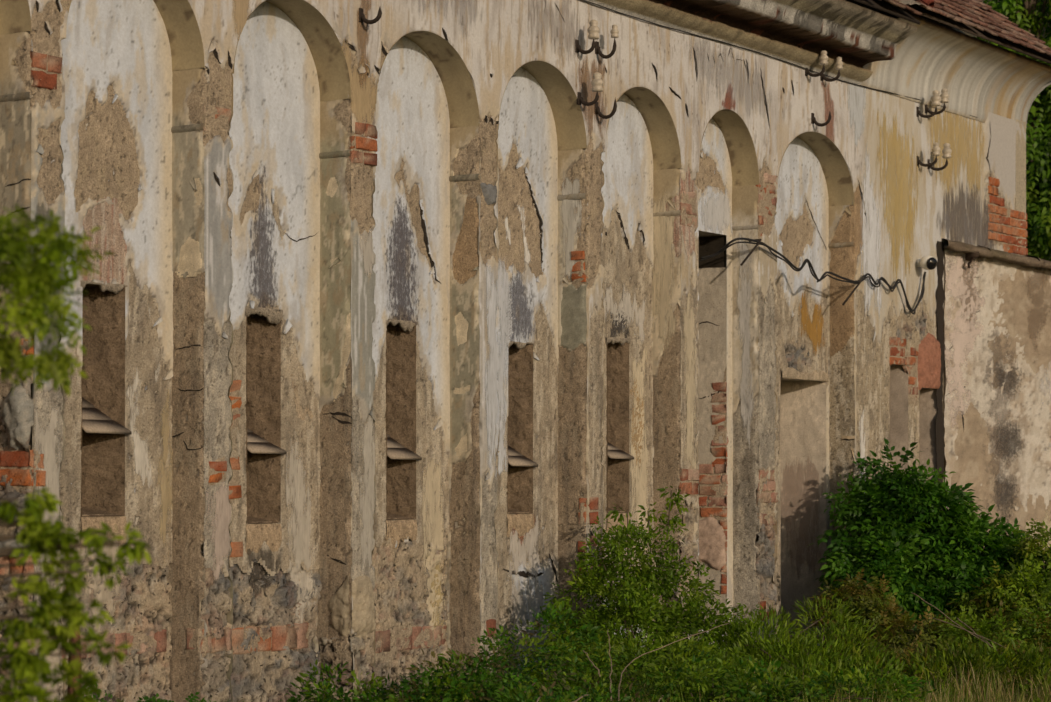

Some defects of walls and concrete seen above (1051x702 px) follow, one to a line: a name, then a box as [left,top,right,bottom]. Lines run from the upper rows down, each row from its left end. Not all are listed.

flaking render [11,0,71,113]
flaking render [187,38,233,146]
flaking render [326,38,387,234]
water stain [848,82,918,315]
water stain [930,109,997,428]
flaking render [0,84,944,702]
flaking render [943,402,1051,542]
water stain [996,365,1019,392]
water stain [997,426,1022,459]